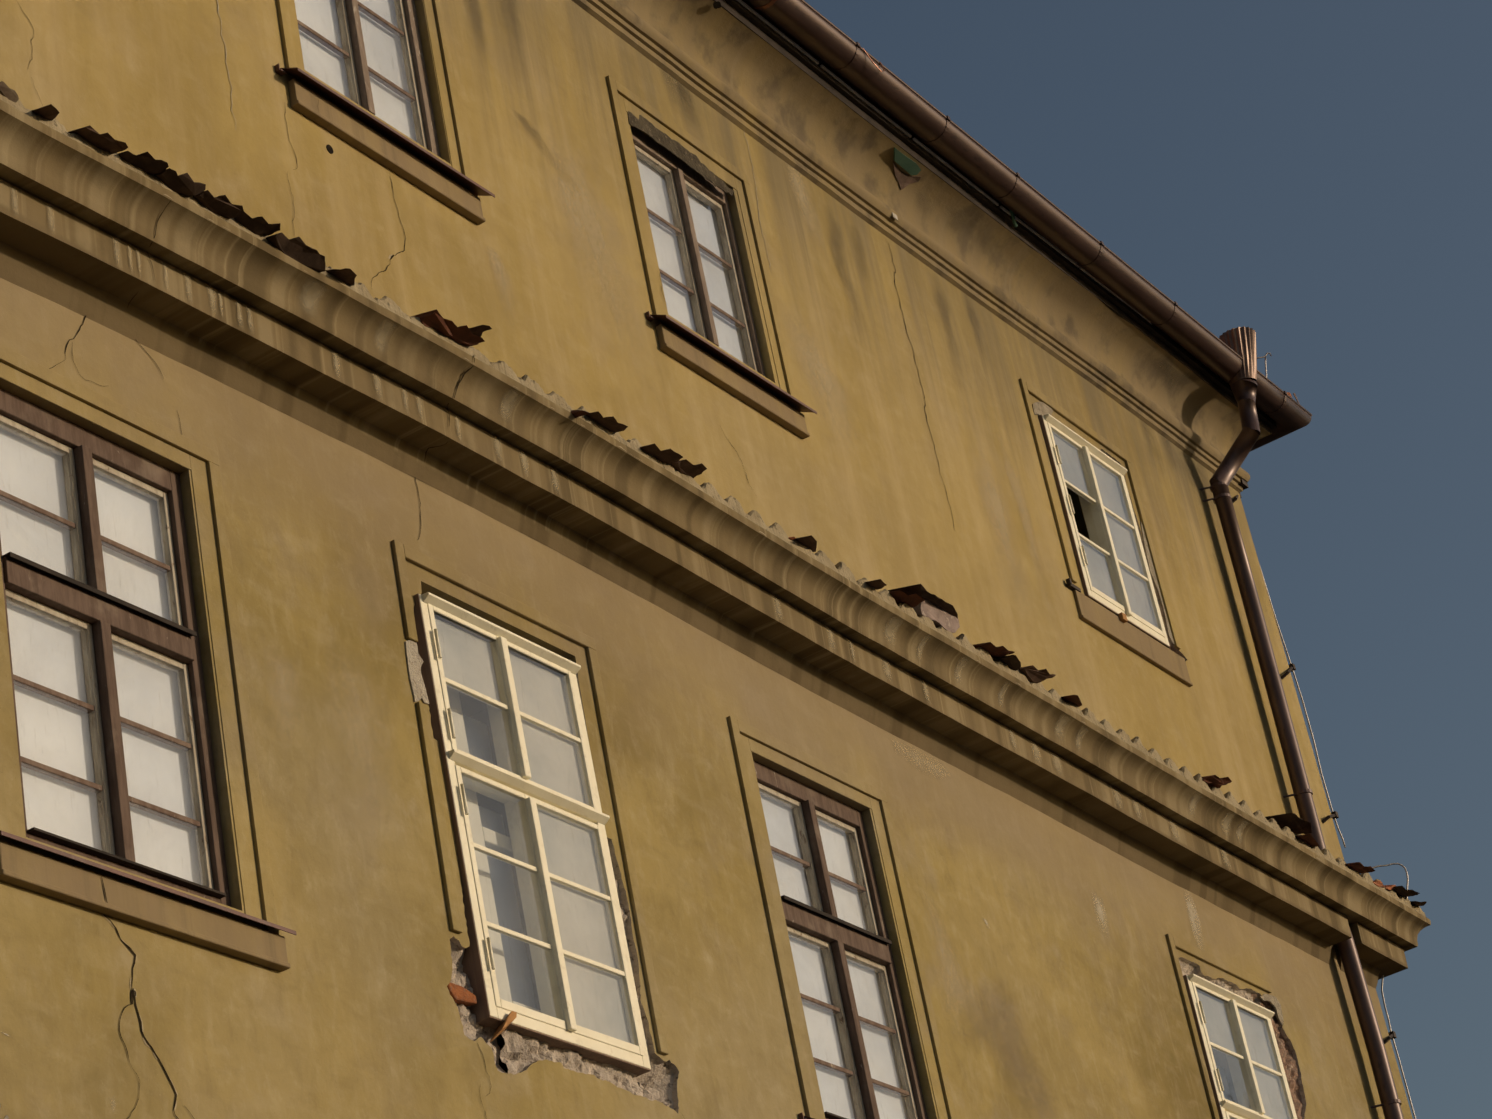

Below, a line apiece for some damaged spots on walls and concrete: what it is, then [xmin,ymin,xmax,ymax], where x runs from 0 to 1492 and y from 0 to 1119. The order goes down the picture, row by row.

spalling [404,640,429,704]
crack [101,876,193,1119]
spalling [447,880,674,1109]
spalling [1179,959,1303,1119]